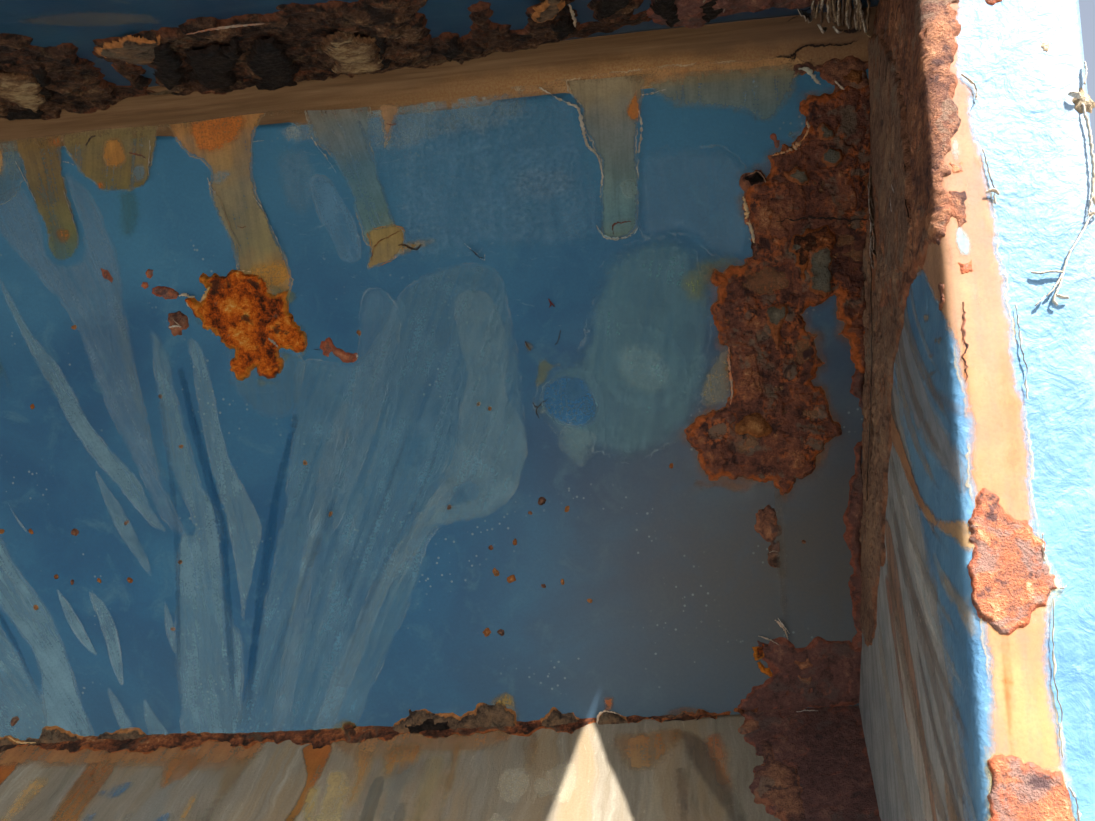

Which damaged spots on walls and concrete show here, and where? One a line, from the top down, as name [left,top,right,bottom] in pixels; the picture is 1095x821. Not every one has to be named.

peeling [798,0,871,38]
rust [15,113,308,384]
water stain [54,373,144,513]
rust [0,233,938,821]
rust [539,0,1075,821]